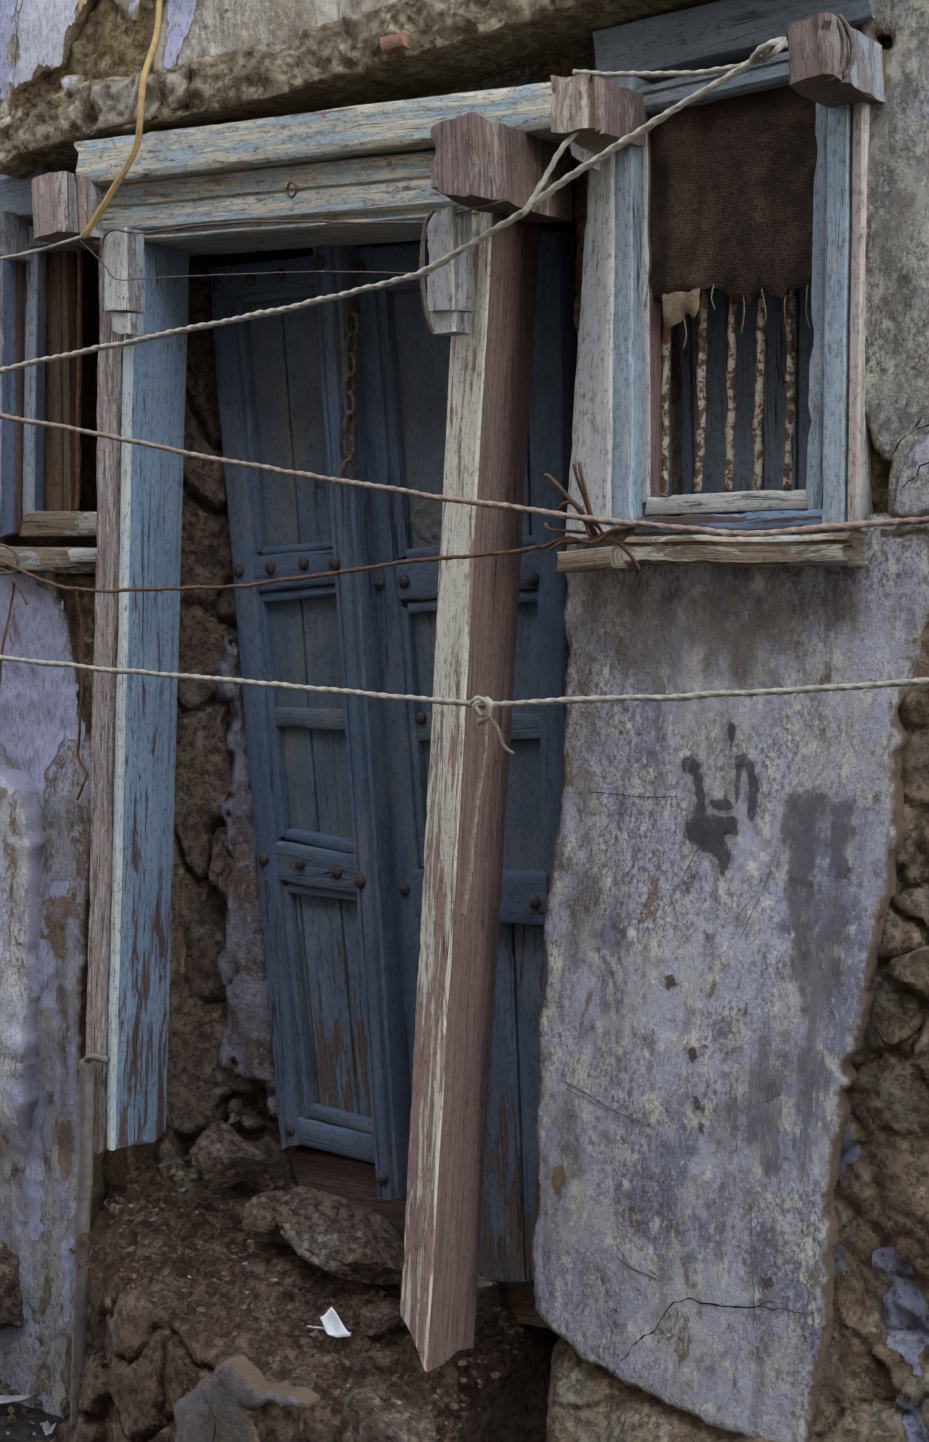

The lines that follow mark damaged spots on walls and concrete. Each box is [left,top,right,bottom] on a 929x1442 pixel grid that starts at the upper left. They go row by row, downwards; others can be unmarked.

spalling [0,0,196,113]
peeling [35,880,83,1013]
crack [609,1298,812,1379]